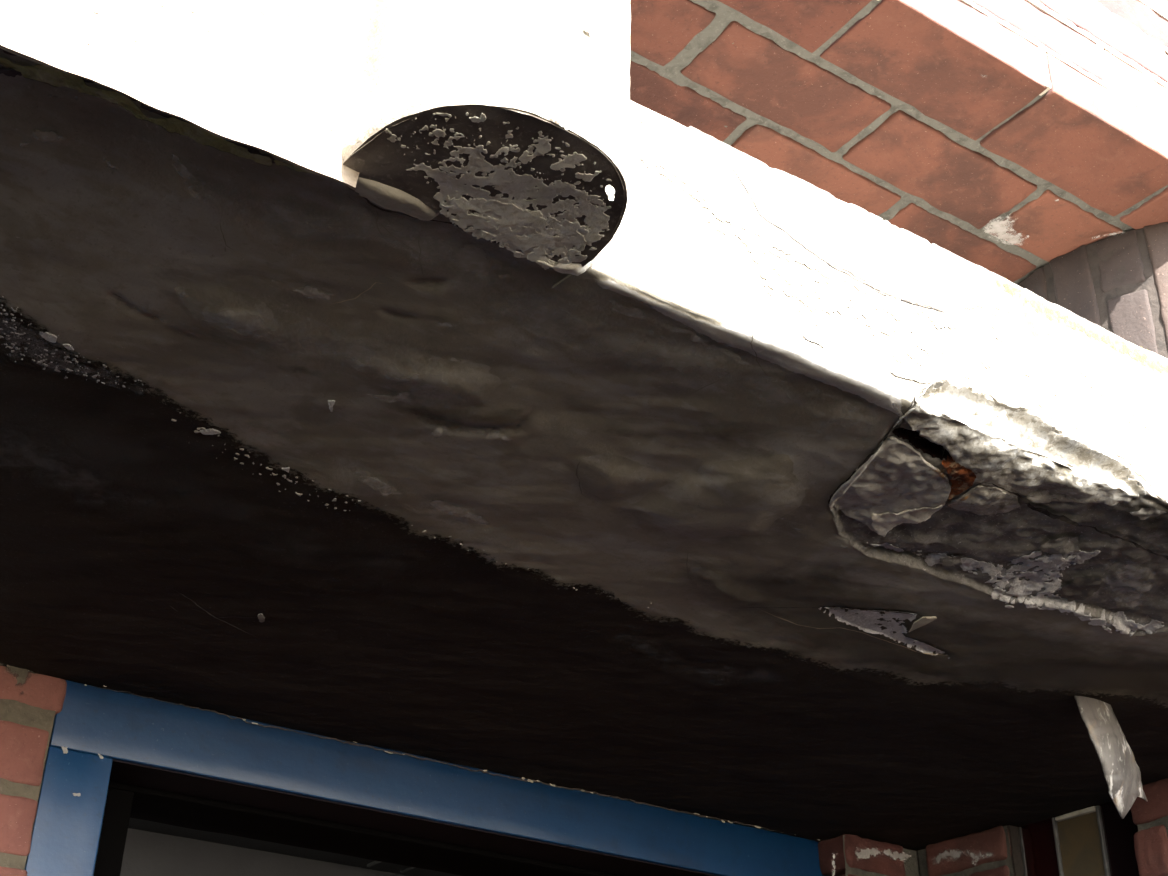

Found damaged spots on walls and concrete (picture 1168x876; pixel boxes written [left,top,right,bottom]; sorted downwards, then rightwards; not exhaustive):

crack [345,185,521,251]
peeling [385,111,615,270]
damp [985,217,1029,244]
damp [0,294,147,394]
peeling [635,119,1168,636]
corrosion [892,427,976,504]
crack [828,379,1167,509]
crack [969,481,1168,560]
spalling [818,607,949,659]
damp [866,542,1164,636]